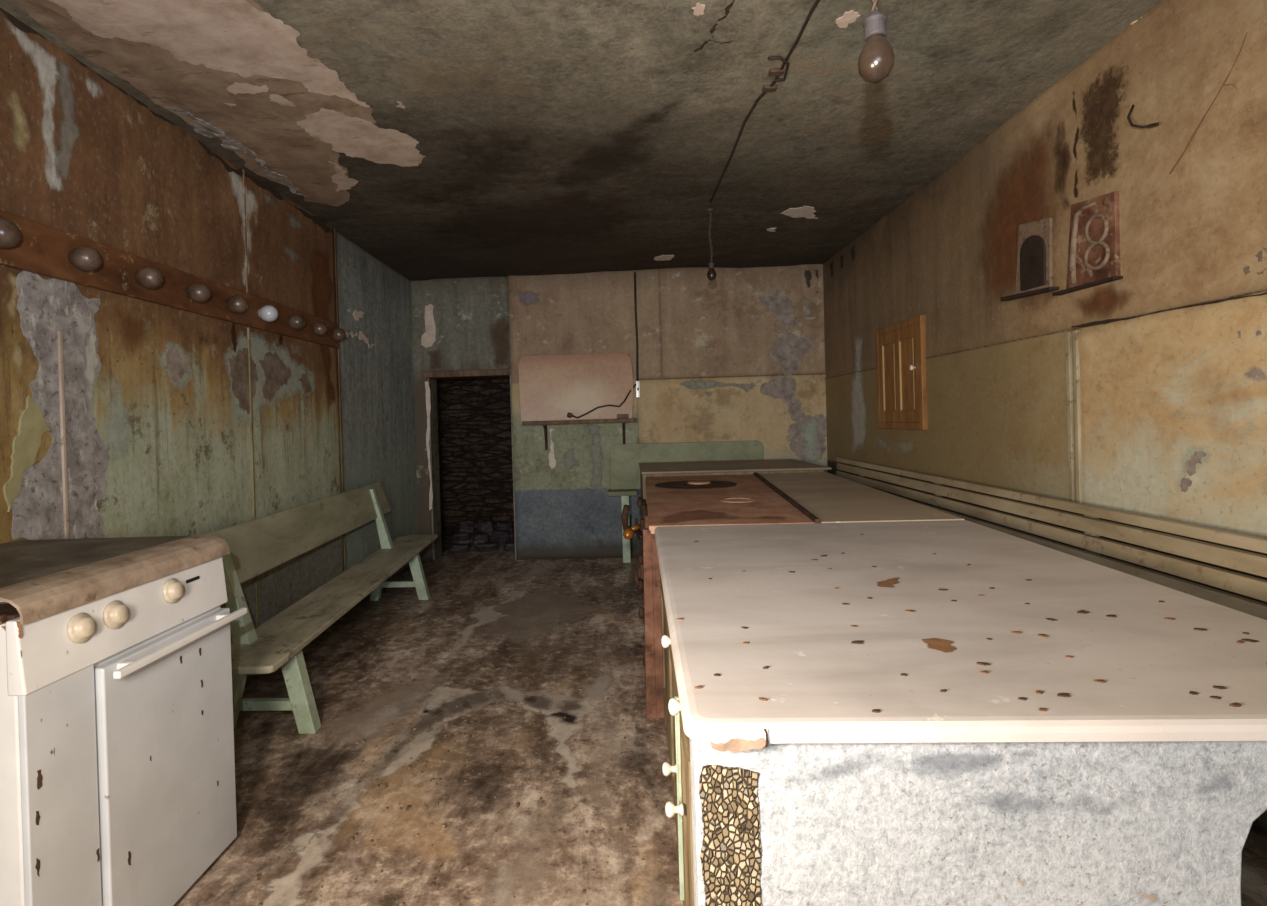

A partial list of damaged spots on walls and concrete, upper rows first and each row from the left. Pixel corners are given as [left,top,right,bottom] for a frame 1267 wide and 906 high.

leakage [13,29,79,190]
peeling [14,0,426,207]
mould [1073,68,1125,197]
flaking render [3,271,127,540]
leakage [229,172,301,284]
peeling [227,336,313,421]
peeling [421,304,436,348]
peeling [681,288,827,462]
flaking render [781,206,818,219]
spalling [1243,248,1267,275]